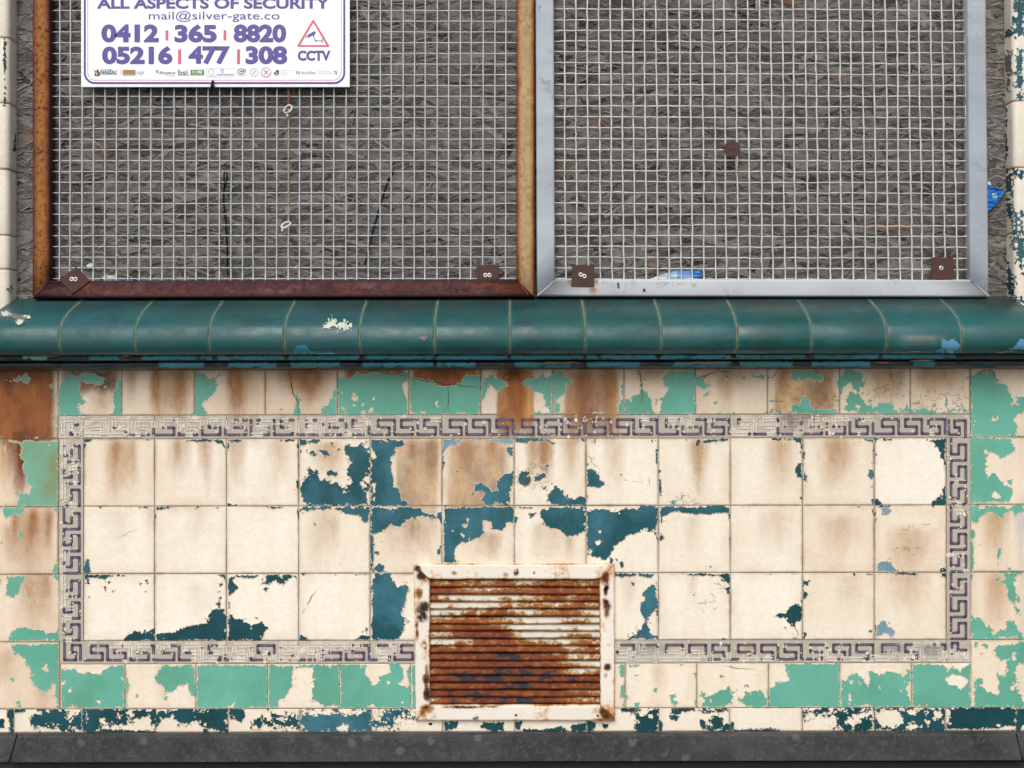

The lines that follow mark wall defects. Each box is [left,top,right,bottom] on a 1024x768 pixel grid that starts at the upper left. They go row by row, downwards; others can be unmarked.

peeling [1005,0,1024,100]
peeling [1005,107,1024,307]
peeling [1,310,31,325]
peeling [323,315,352,332]
corrosion [0,370,54,478]
corrosion [497,370,533,433]
corrosion [566,373,617,432]
peeling [0,338,1024,733]
corrosion [414,565,429,649]
corrosion [602,571,610,617]
corrosion [420,666,498,715]
corrosion [594,708,612,721]